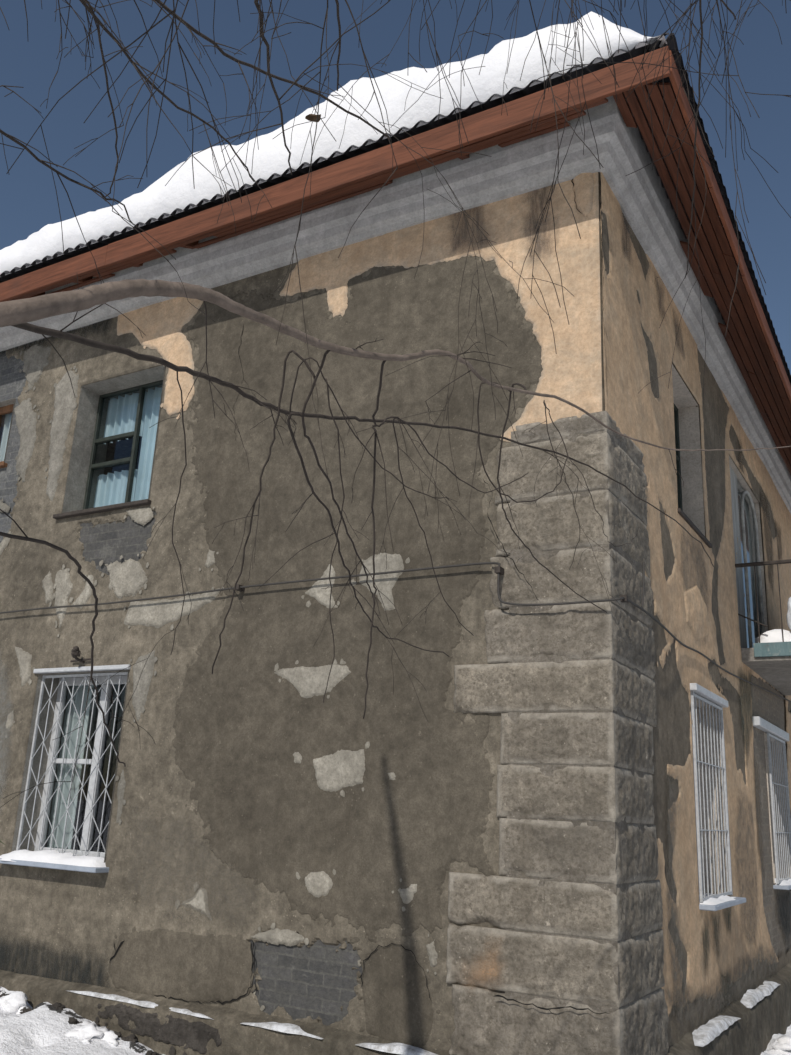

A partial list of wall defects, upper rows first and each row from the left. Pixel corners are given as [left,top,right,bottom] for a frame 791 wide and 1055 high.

peeling [117,297,203,419]
flaking render [0,344,79,555]
flaking render [42,507,225,637]
peeling [301,564,340,608]
peeling [351,553,410,611]
peeling [274,659,351,699]
flaking render [667,348,791,1047]
peeling [293,741,370,797]
spalling [652,600,693,903]
peeling [296,869,336,898]
crack [154,941,259,1004]
crack [494,995,609,1014]